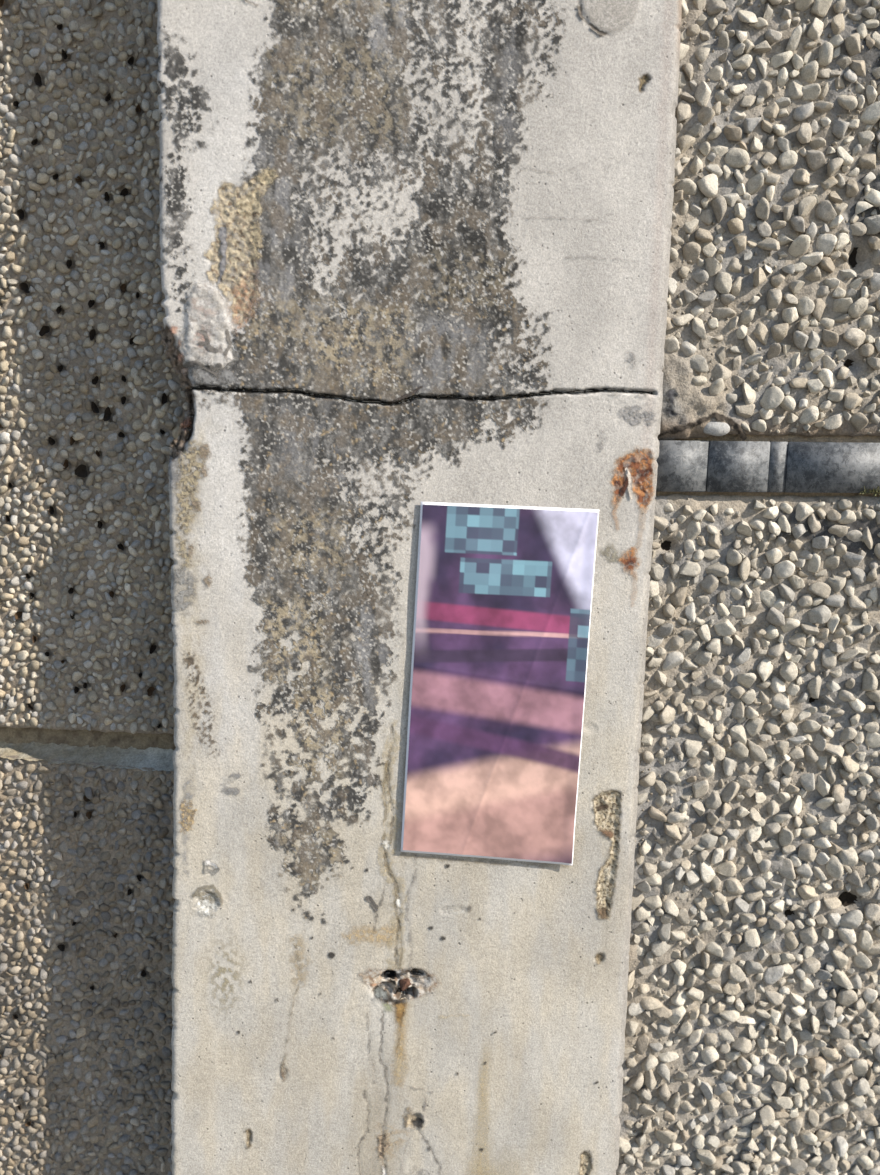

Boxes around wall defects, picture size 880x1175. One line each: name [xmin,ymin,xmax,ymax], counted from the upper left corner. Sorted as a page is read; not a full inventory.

mould [152,32,212,312]
peeling [204,169,278,328]
leakage [183,0,566,924]
crack [188,385,746,441]
corrosion [611,449,654,527]
corrosion [601,544,639,577]
crack [365,726,416,971]
spalling [593,790,622,919]
crack [357,1014,390,1175]
corrosion [385,1002,406,1084]
spalling [359,968,439,1005]